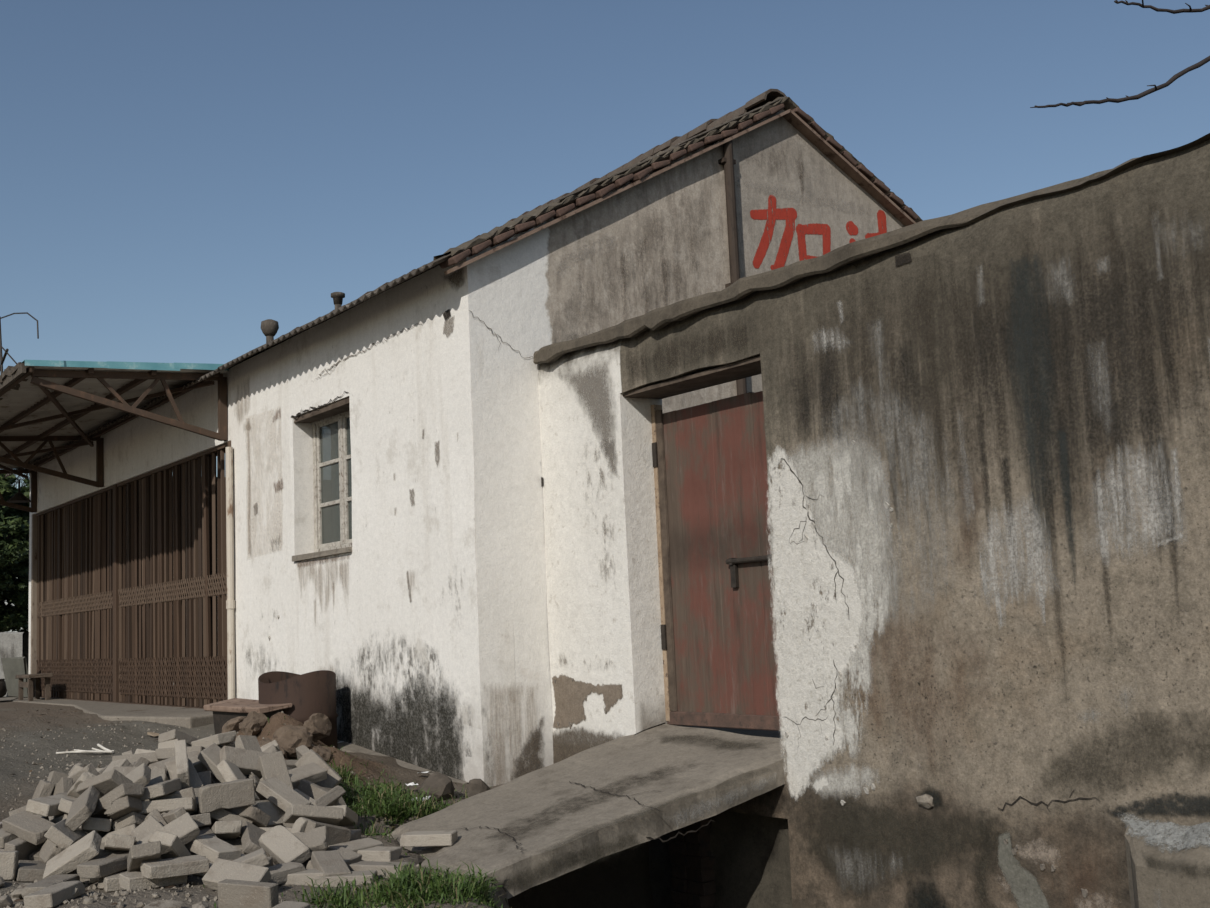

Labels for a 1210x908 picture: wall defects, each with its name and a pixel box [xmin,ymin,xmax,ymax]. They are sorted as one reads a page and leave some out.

crack [291,323,423,419]
water stain [570,366,616,471]
water stain [802,225,1183,626]
crack [781,458,849,615]
water stain [336,647,463,779]
peeling [515,659,622,778]
crack [786,660,837,747]
crack [569,781,715,842]
water stain [808,796,1001,908]